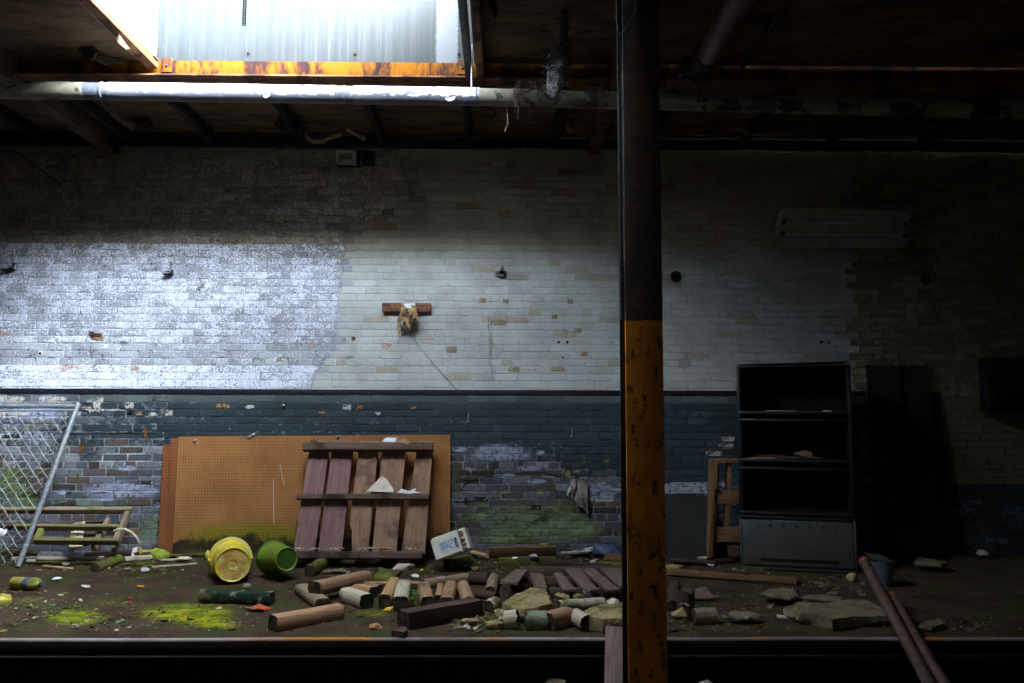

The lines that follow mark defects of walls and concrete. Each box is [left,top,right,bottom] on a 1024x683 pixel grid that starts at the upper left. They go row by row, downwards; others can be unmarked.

peeling [0,158,411,443]